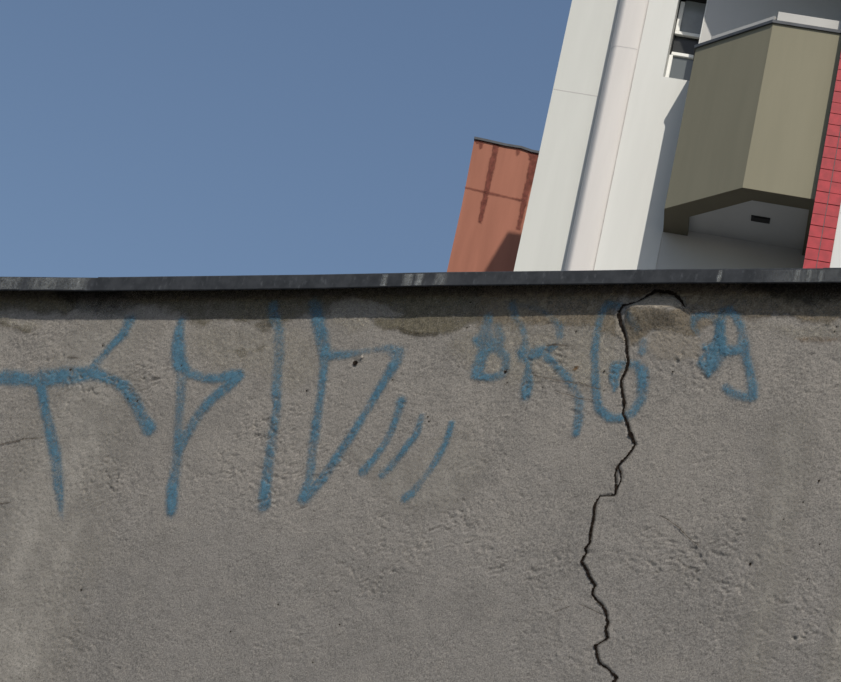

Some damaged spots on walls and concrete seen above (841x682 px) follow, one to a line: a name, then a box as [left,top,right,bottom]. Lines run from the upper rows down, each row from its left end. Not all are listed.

water stain [0,275,841,682]
crack [555,289,685,682]